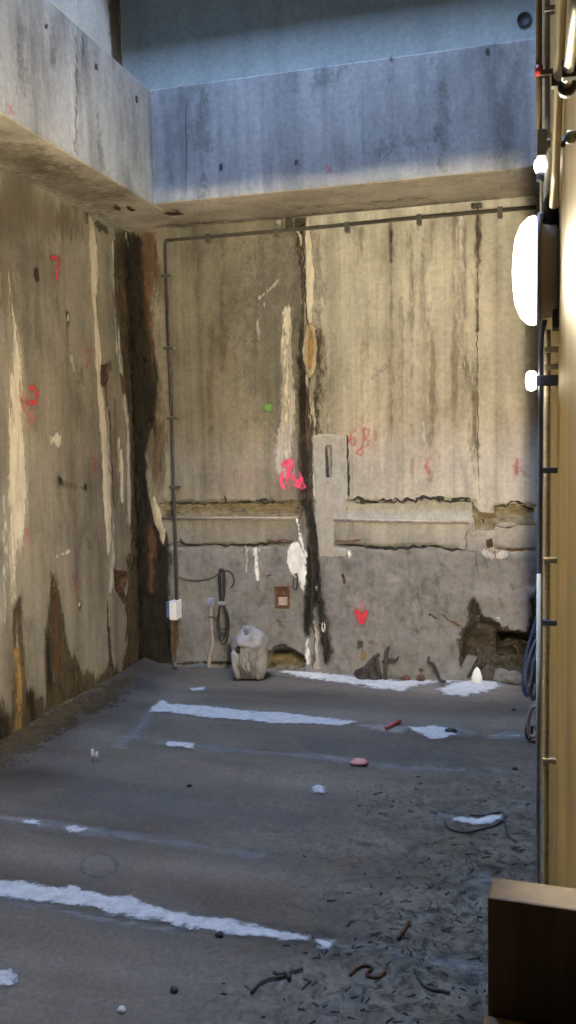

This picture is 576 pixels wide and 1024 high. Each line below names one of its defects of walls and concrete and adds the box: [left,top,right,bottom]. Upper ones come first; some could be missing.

crack [300,216,308,345]
water stain [458,215,481,315]
water stain [274,218,333,669]
rust [147,526,157,591]
spalling [150,495,300,544]
crack [173,377,535,668]
rust [12,596,27,731]
rust [45,575,82,712]
spalling [429,598,536,681]